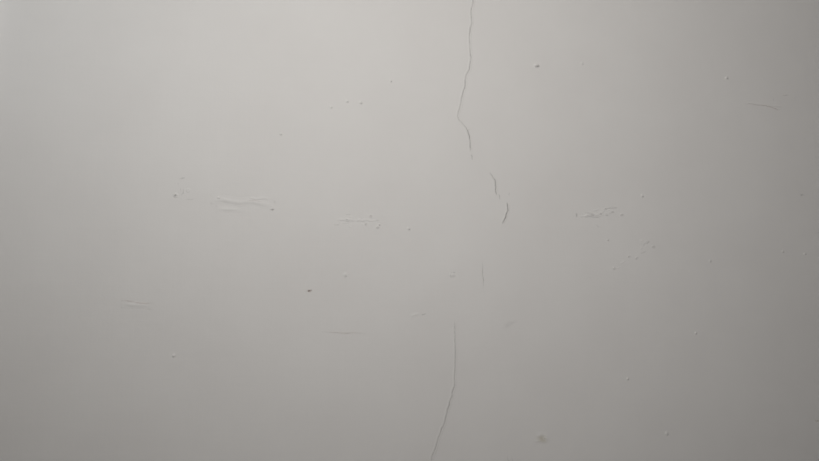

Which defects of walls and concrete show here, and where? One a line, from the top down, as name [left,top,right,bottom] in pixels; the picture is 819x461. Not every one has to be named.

crack [456,0,475,152]
crack [488,171,510,226]
crack [429,319,458,461]